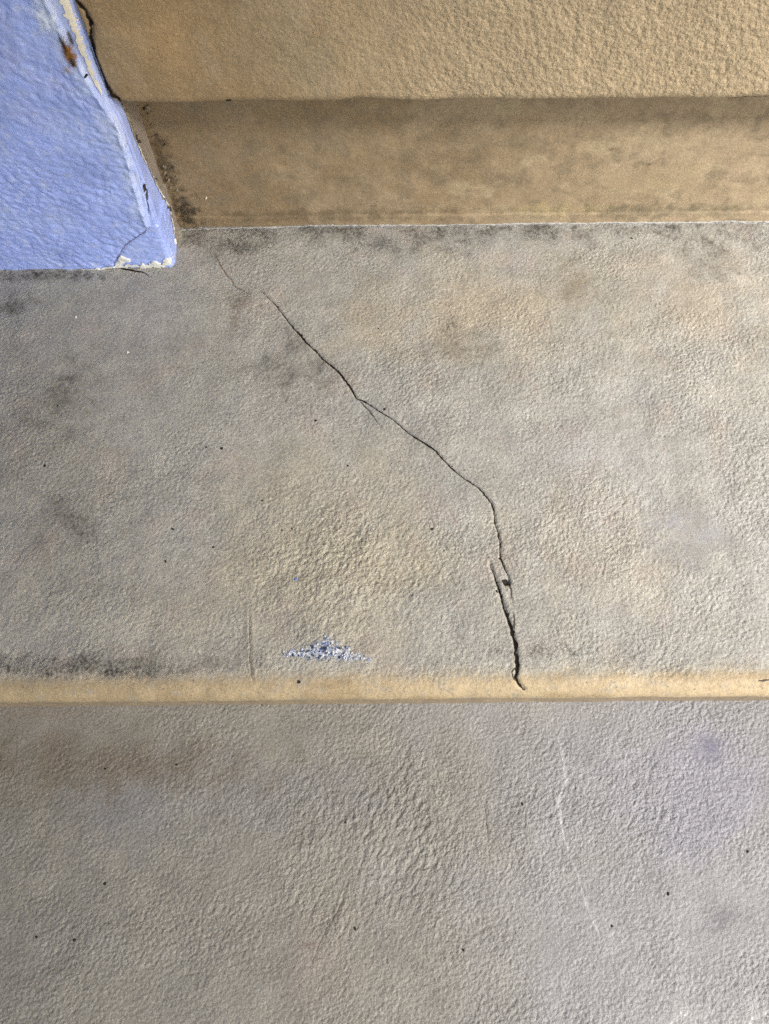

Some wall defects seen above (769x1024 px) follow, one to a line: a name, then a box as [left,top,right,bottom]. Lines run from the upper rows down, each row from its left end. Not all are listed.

peeling [283,636,371,661]
crack [216,256,525,690]